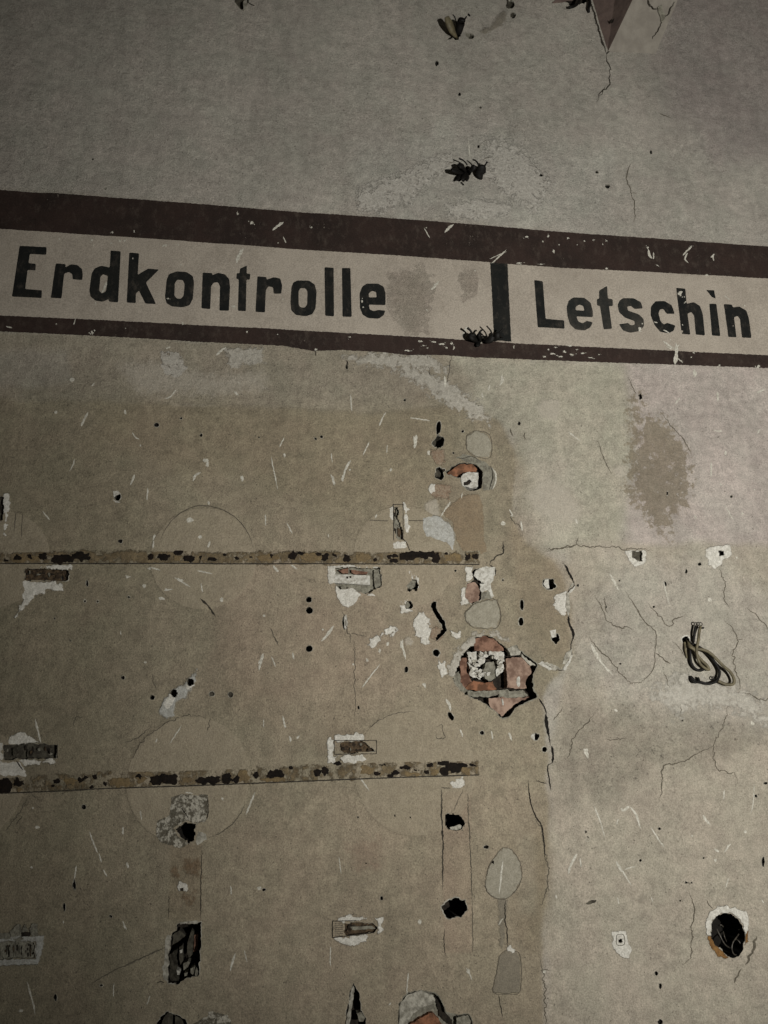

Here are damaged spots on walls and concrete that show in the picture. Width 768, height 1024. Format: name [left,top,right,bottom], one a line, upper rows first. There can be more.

spalling [427,447,497,491]
damp [617,382,701,546]
corrosion [0,548,482,568]
crack [543,539,647,553]
spalling [326,565,382,629]
spalling [352,564,579,857]
crack [589,591,686,713]
crack [660,569,768,796]
corrosion [0,757,483,795]
spalling [156,794,209,848]
crack [440,787,550,1022]
spalling [398,989,473,1024]